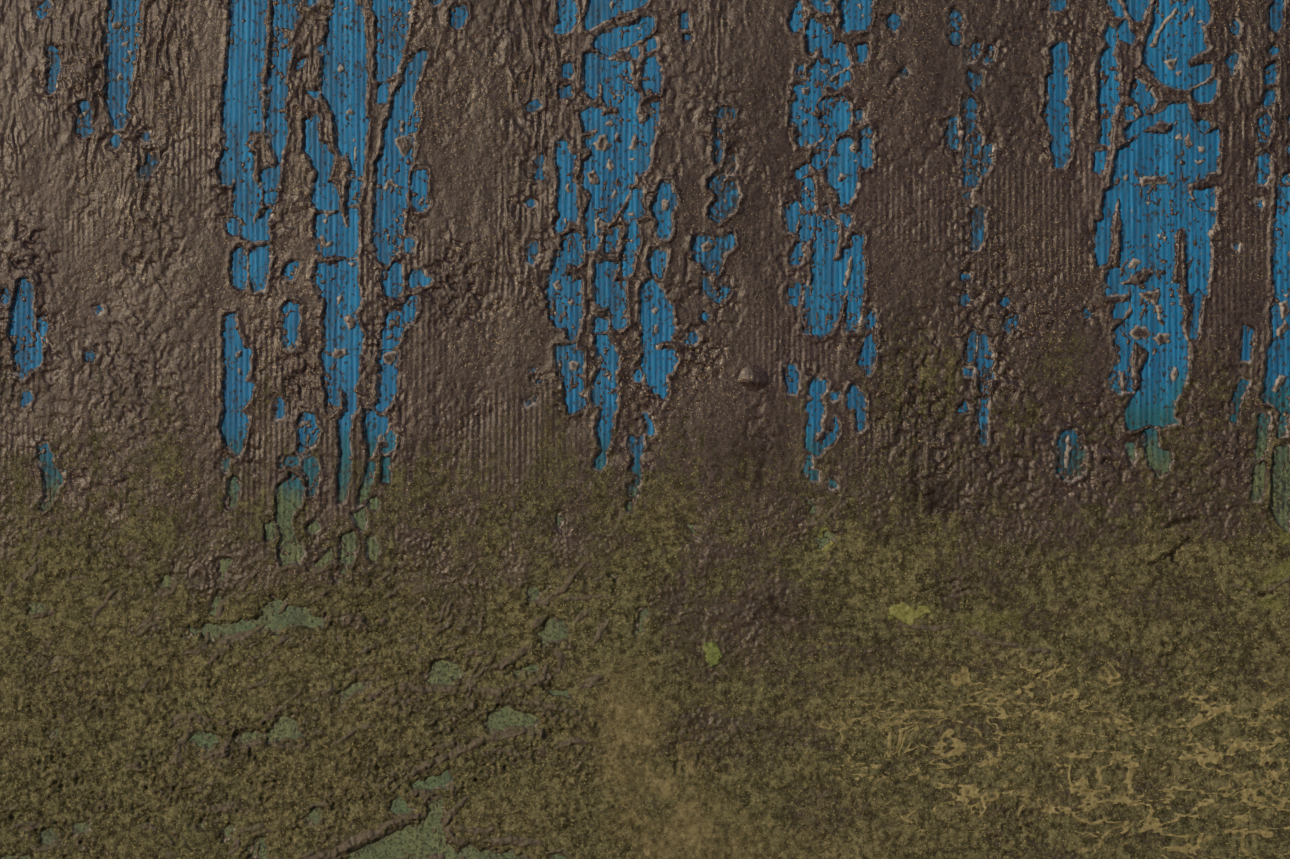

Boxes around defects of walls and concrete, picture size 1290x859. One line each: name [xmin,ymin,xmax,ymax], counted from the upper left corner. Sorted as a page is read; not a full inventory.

peeling [0,279,48,407]
peeling [106,0,142,148]
peeling [219,0,432,582]
peeling [535,0,740,469]
peeling [785,364,866,488]
peeling [785,0,877,375]
peeling [946,9,993,251]
peeling [1045,42,1071,168]
peeling [1093,0,1239,477]
peeling [1230,0,1290,531]
water stain [593,657,782,859]
water stain [817,648,1290,859]